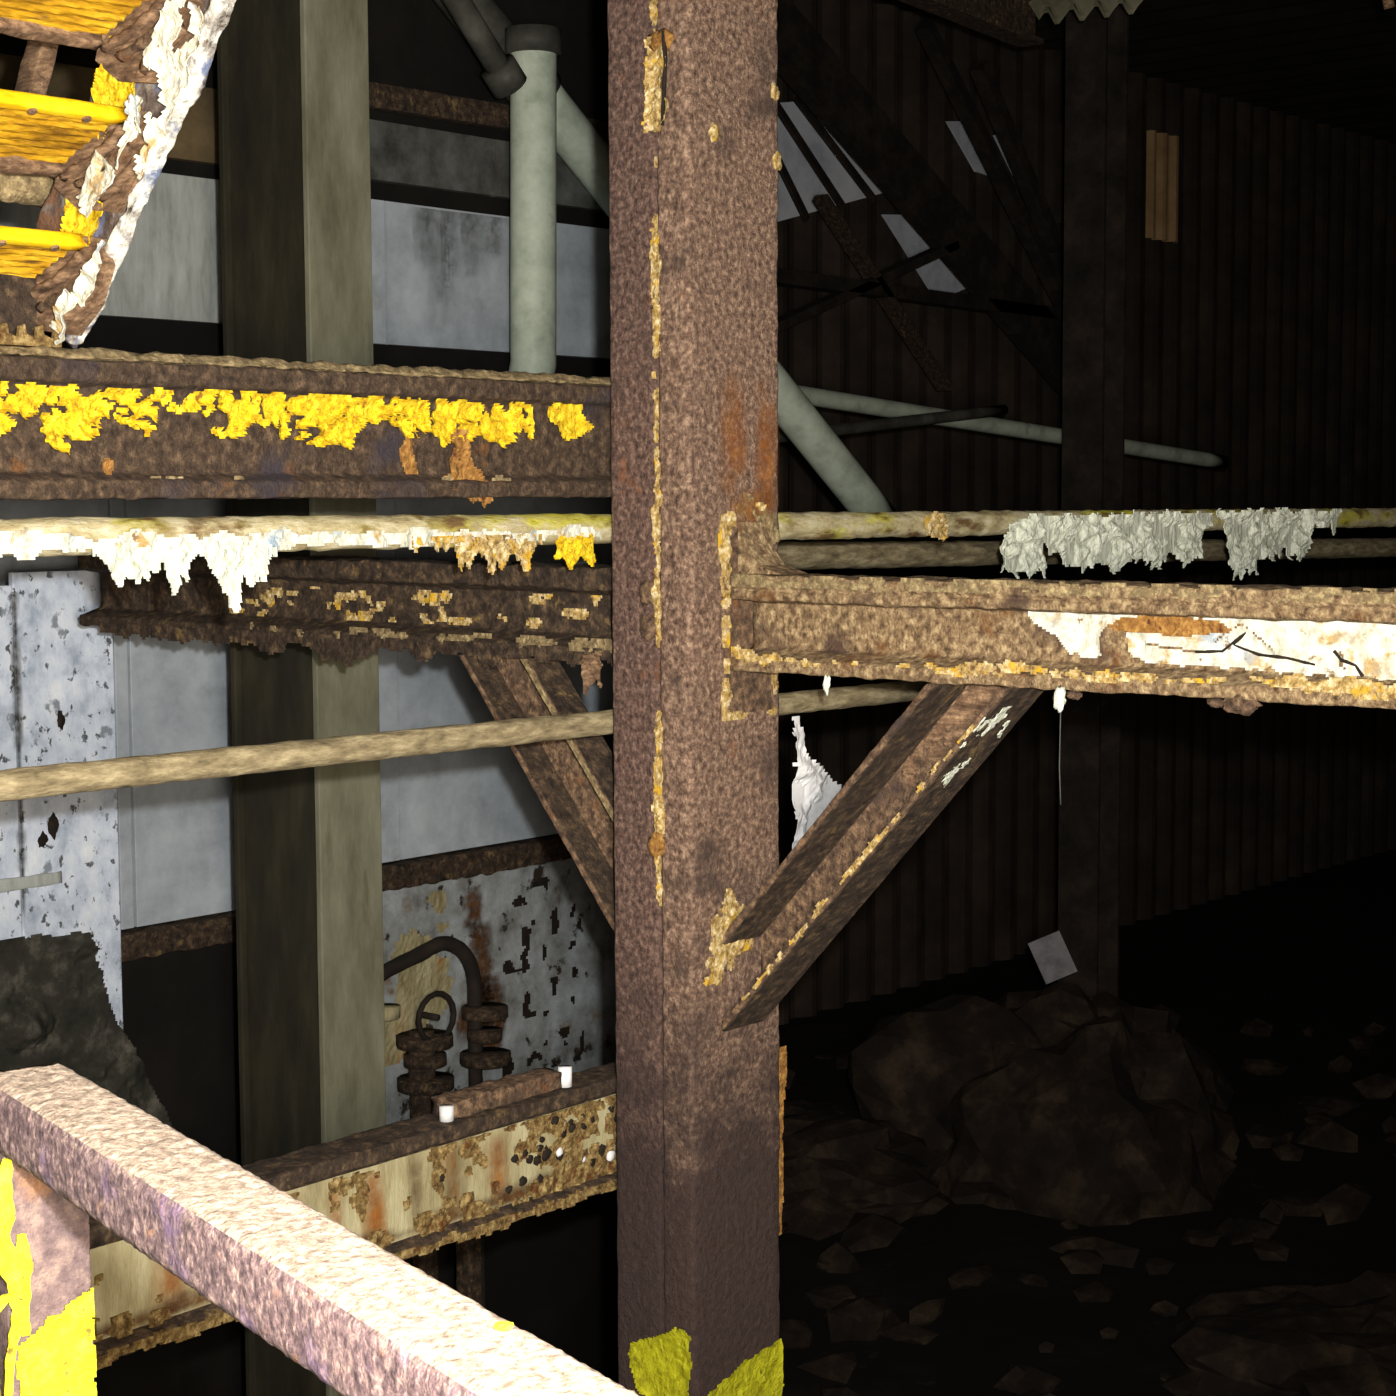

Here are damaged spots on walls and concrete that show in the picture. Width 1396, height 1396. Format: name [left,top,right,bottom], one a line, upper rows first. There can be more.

rust [641,0,675,133]
peeling [49,0,204,345]
peeling [0,381,594,508]
rust [639,214,663,648]
rust [718,501,1239,721]
peeling [1028,611,1396,681]
crack [1195,632,1364,677]
rust [1279,587,1396,604]
rust [896,659,1263,793]
rust [703,888,753,986]
rust [328,1094,617,1259]
rust [92,1271,238,1370]